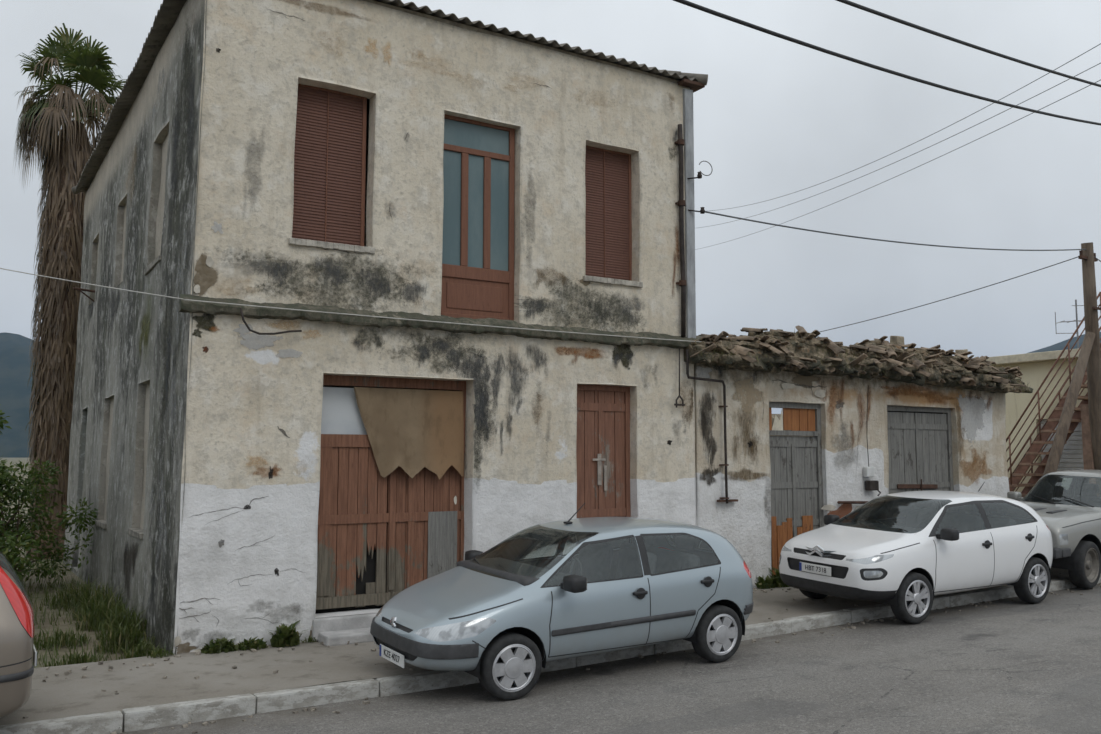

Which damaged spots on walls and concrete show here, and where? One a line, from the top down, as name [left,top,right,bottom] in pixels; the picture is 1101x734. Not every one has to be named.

water stain [171,31,195,206]
spalling [192,254,218,296]
water stain [235,253,424,310]
water stain [514,273,640,332]
water stain [399,332,546,480]
water stain [612,344,633,370]
spalling [683,325,1033,443]
water stain [680,389,718,485]
water stain [731,469,762,480]
crack [188,496,268,524]
water stain [122,543,138,606]
crack [179,568,304,625]